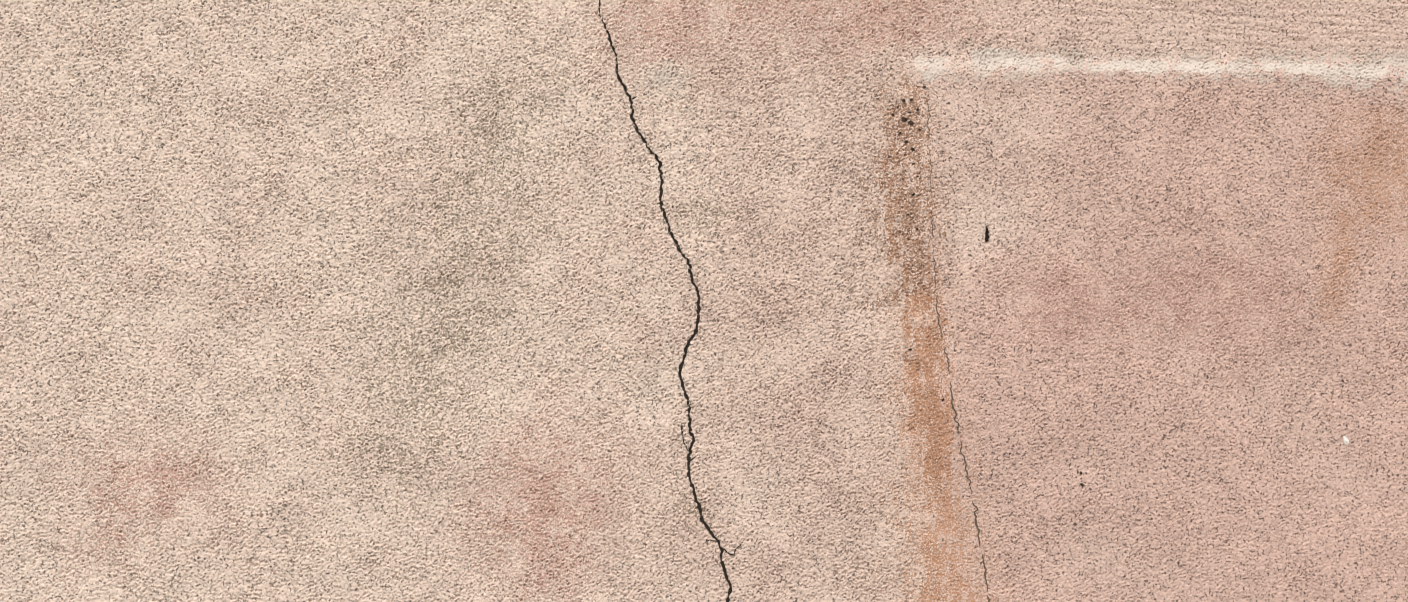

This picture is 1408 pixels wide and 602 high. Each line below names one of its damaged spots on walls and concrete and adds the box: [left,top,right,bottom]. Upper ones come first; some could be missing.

crack [599,0,743,602]